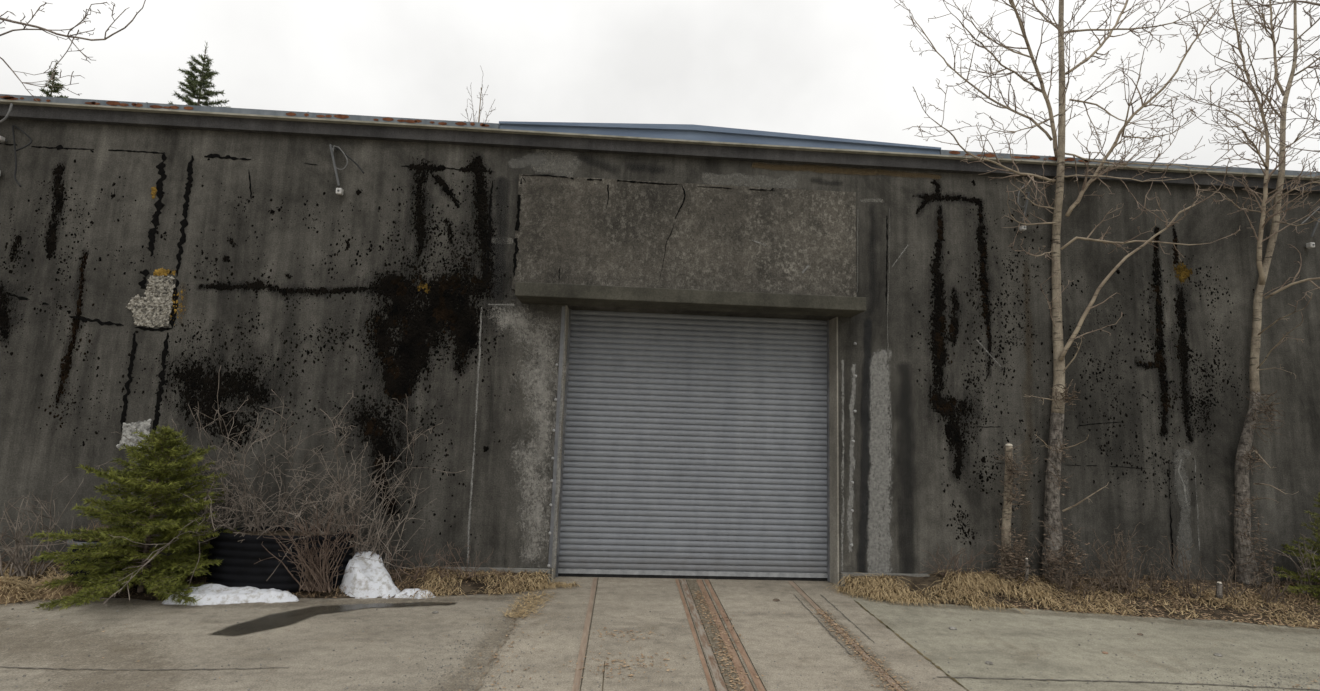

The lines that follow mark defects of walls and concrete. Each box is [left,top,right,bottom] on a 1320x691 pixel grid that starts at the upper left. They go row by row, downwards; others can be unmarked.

crack [389,165,775,290]
spalling [126,275,175,328]
water stain [841,207,913,574]